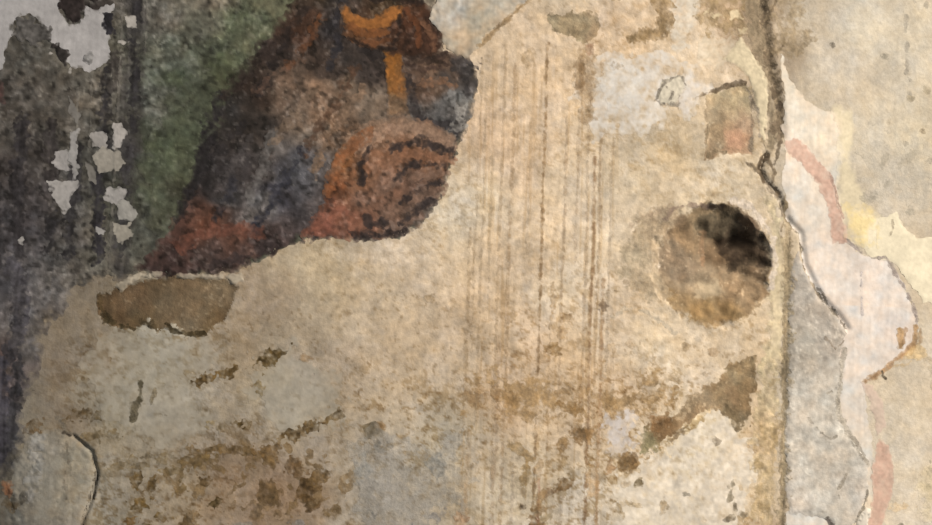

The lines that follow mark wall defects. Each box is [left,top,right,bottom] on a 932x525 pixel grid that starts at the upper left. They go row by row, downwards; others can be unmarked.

peeling [0,0,130,74]
peeling [124,15,137,29]
peeling [46,95,138,245]
spalling [695,79,763,161]
crack [745,0,835,315]
leakage [103,0,737,525]
spalling [96,271,244,338]
leakage [22,417,45,435]
leakage [61,406,123,444]
crack [60,419,105,525]